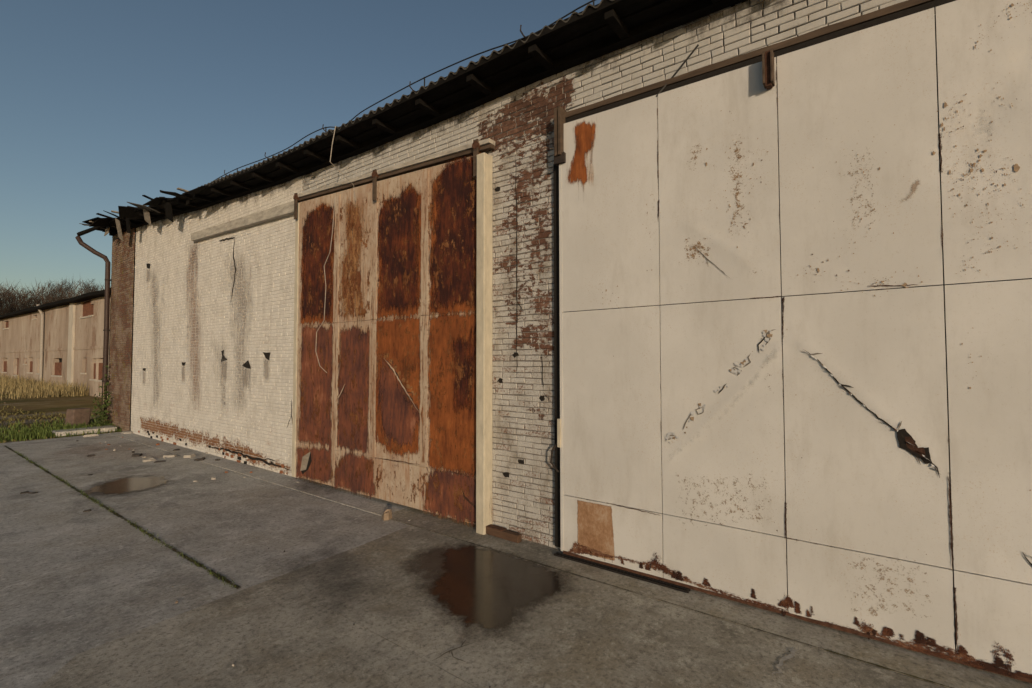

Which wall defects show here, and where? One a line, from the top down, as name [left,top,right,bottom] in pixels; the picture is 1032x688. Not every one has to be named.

rust [568,122,596,185]
rust [296,153,507,531]
spalling [138,417,290,475]
crack [803,349,941,478]
rust [568,499,814,617]
rust [826,588,1032,679]